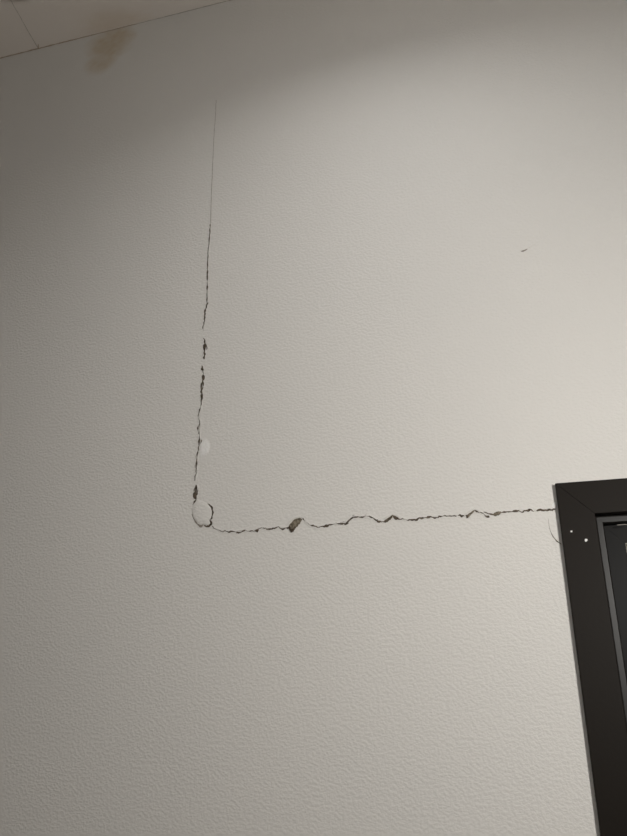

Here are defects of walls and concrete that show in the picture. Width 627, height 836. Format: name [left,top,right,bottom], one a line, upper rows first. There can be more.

crack [191,112,216,504]
crack [211,506,561,544]